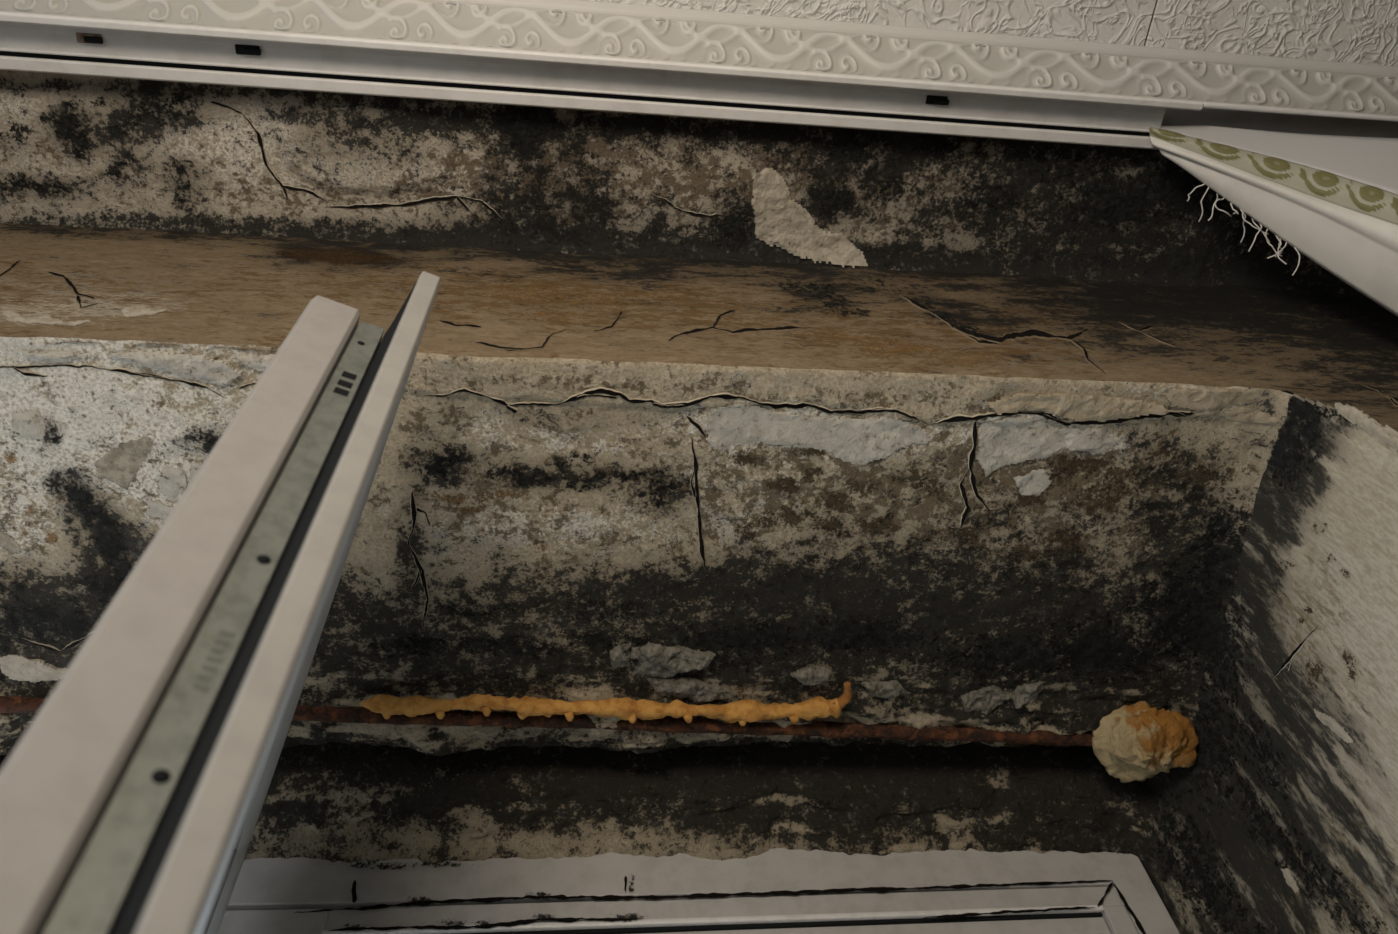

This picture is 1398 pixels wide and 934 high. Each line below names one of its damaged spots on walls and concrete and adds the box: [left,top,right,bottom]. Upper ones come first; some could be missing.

water stain [0,94,106,160]
crack [211,100,502,219]
peeling [751,168,868,268]
crack [0,363,256,398]
crack [439,312,622,353]
crack [425,387,1194,570]
peeling [706,402,928,465]
water stain [1264,396,1347,494]
water stain [0,468,137,654]
peeling [0,655,67,683]
spalling [610,642,737,703]
water stain [294,443,1388,934]